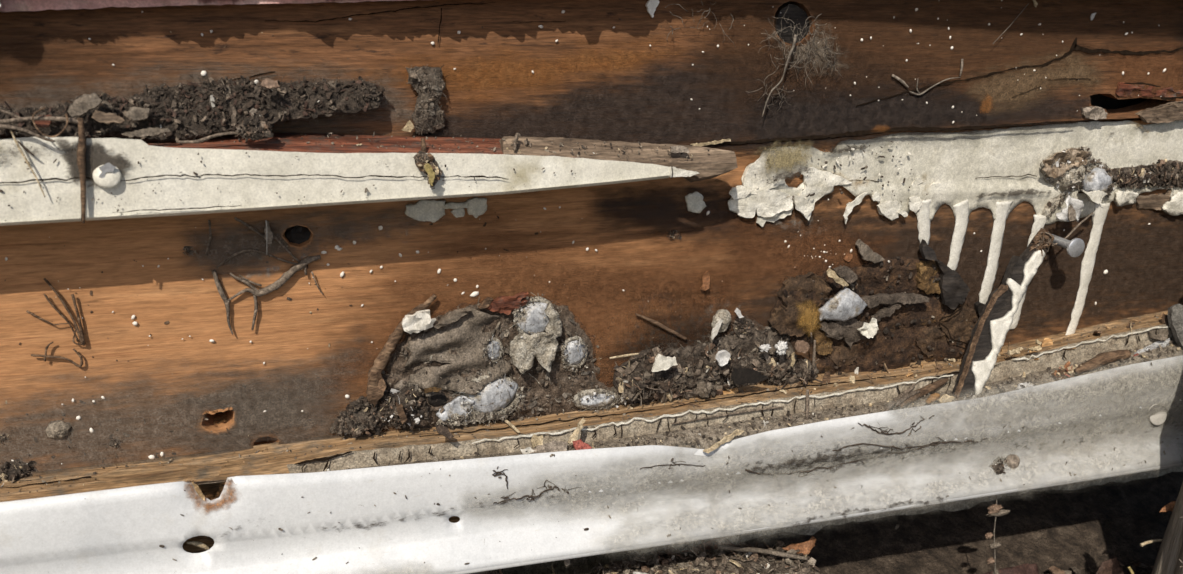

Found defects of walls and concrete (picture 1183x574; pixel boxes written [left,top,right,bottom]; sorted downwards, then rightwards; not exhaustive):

crack [691,38,1183,146]
crack [975,172,1037,180]
leakage [0,187,1183,473]
corrosion [186,480,236,512]